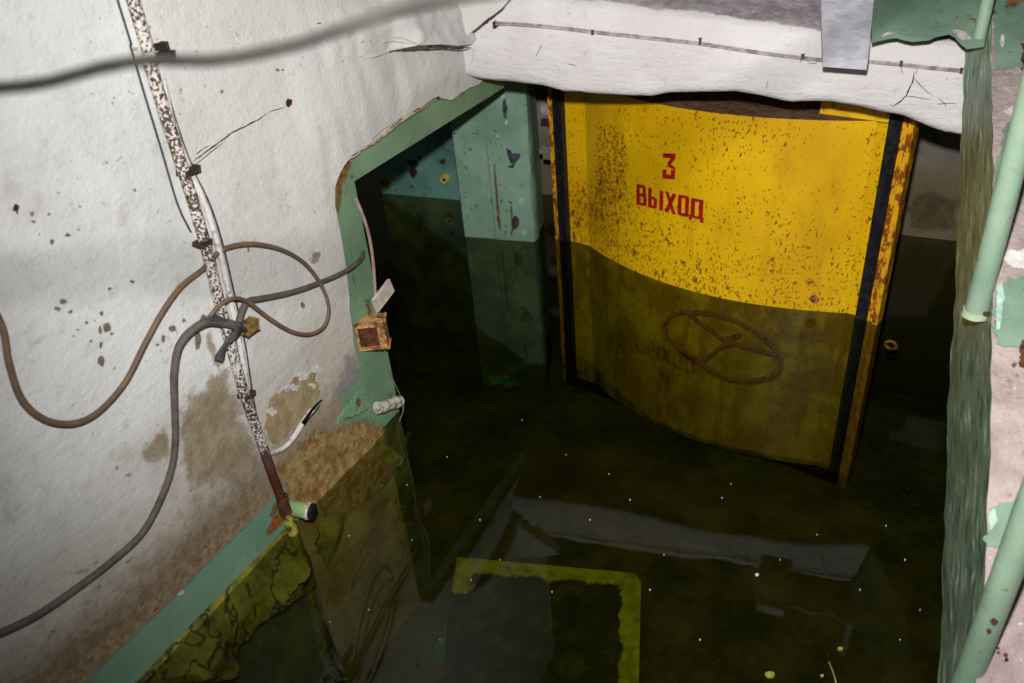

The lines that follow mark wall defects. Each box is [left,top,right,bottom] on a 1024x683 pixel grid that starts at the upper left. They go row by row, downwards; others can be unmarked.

flaking render [871,0,1024,71]
crack [192,107,284,164]
peeling [991,248,1024,367]
flaking render [264,365,324,445]
damp [25,332,398,683]